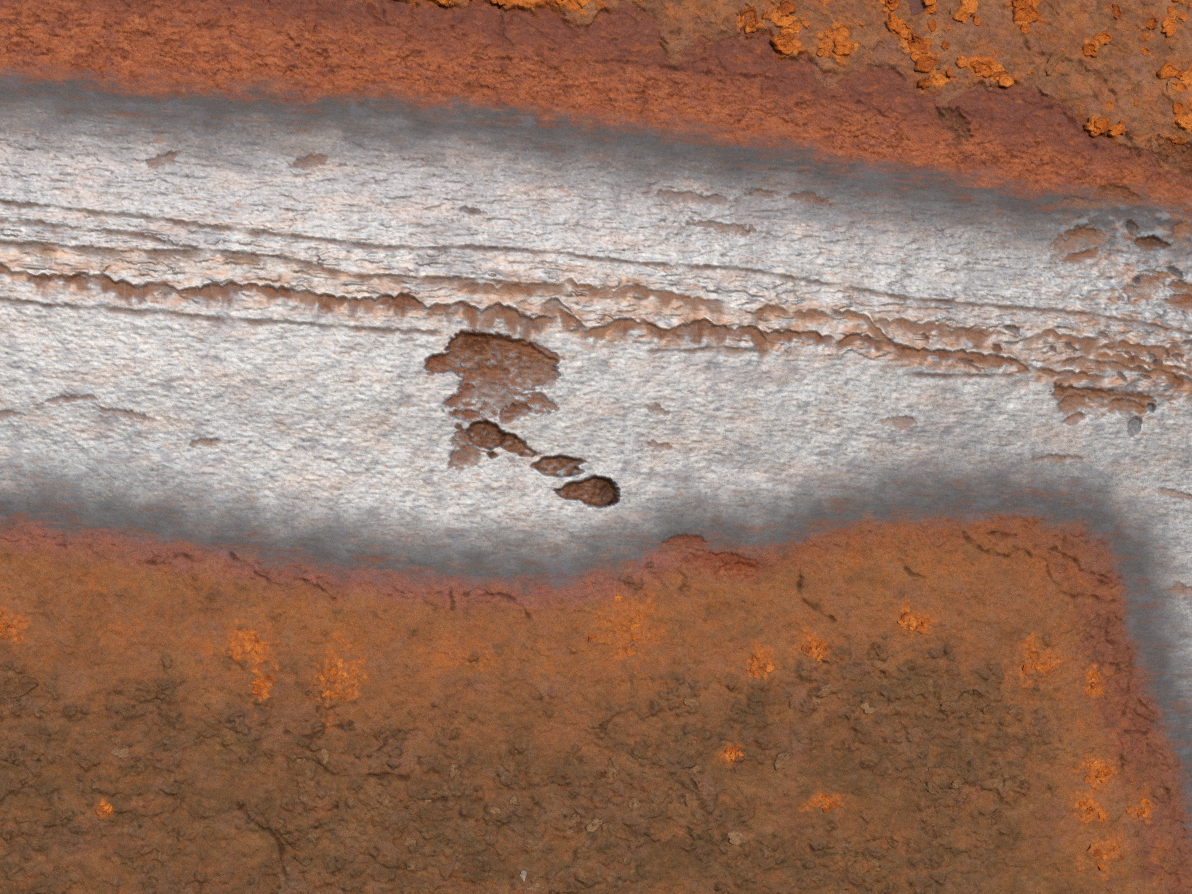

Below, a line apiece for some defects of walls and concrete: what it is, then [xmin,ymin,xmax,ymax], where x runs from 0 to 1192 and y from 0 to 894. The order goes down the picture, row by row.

rust [394,0,1192,186]
spalling [1123,132,1192,194]
spalling [424,330,621,508]
spalling [989,326,1028,360]
spalling [1046,332,1192,440]
spalling [1050,220,1192,269]
spalling [1116,267,1192,317]
rust [0,514,1192,894]